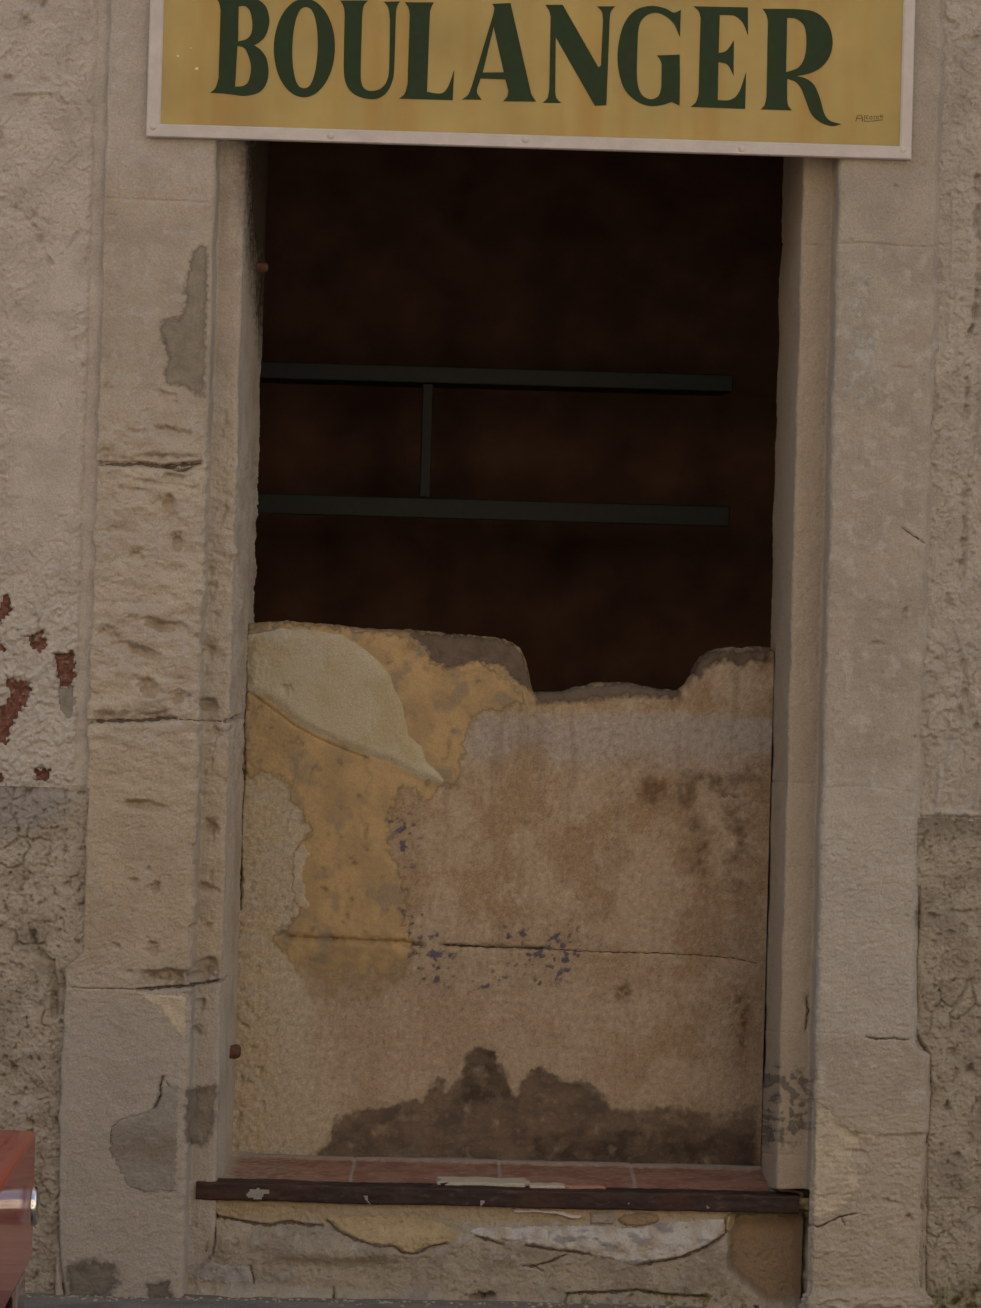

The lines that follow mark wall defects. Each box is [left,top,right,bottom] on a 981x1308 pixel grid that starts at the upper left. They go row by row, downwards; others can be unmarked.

spalling [0,594,13,624]
spalling [27,630,77,718]
spalling [0,676,32,745]
spalling [34,768,51,781]
peeling [242,620,530,983]
crack [304,937,757,964]
water stain [317,1048,809,1166]
crack [215,1216,446,1255]
crack [476,1236,589,1271]
crack [565,1218,727,1303]